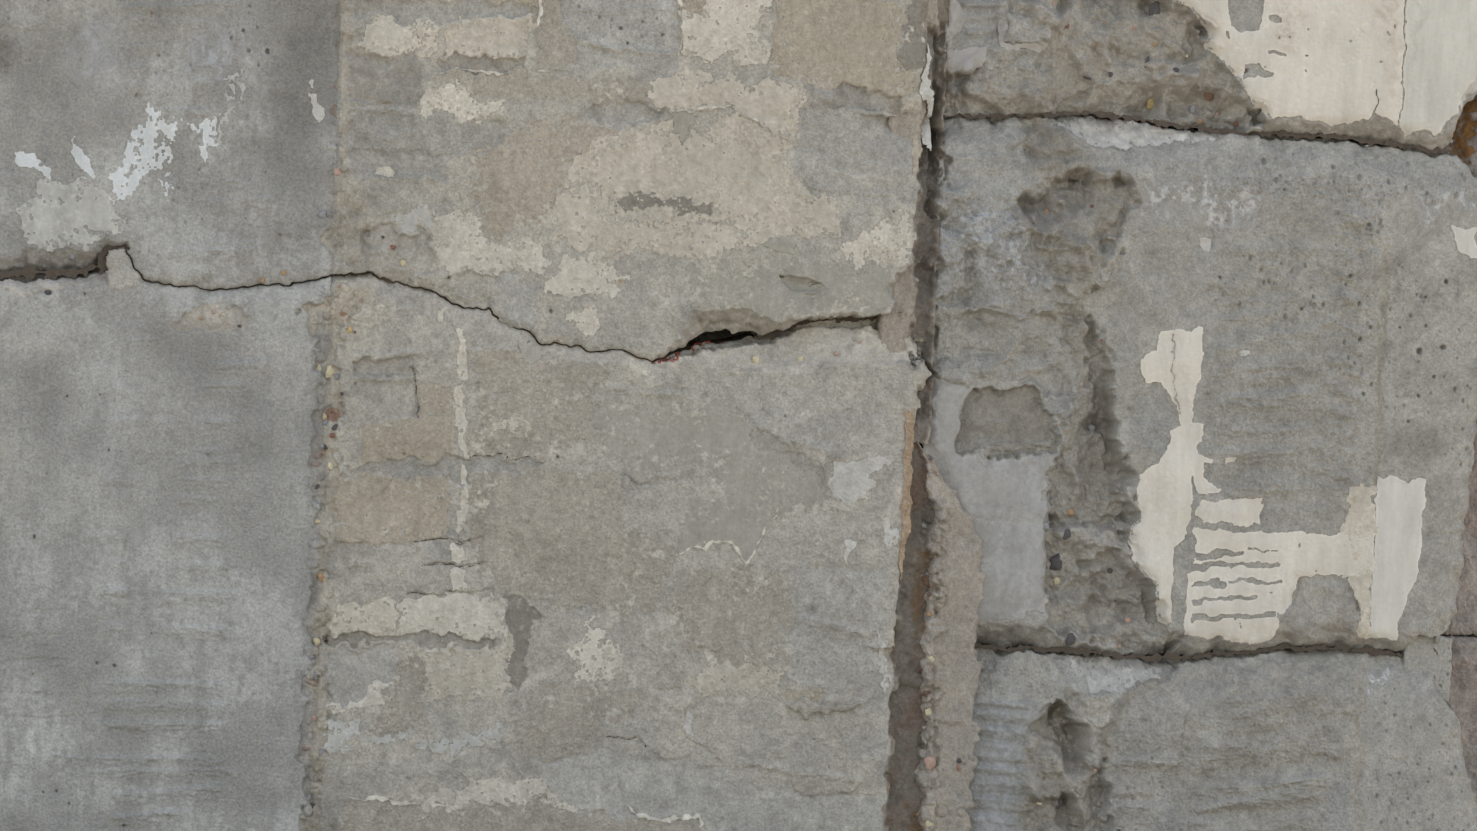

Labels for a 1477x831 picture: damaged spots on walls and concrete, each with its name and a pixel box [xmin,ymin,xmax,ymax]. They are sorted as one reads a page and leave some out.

corrosion [1452,99,1477,165]
crack [0,244,877,364]
spalling [296,0,1477,831]